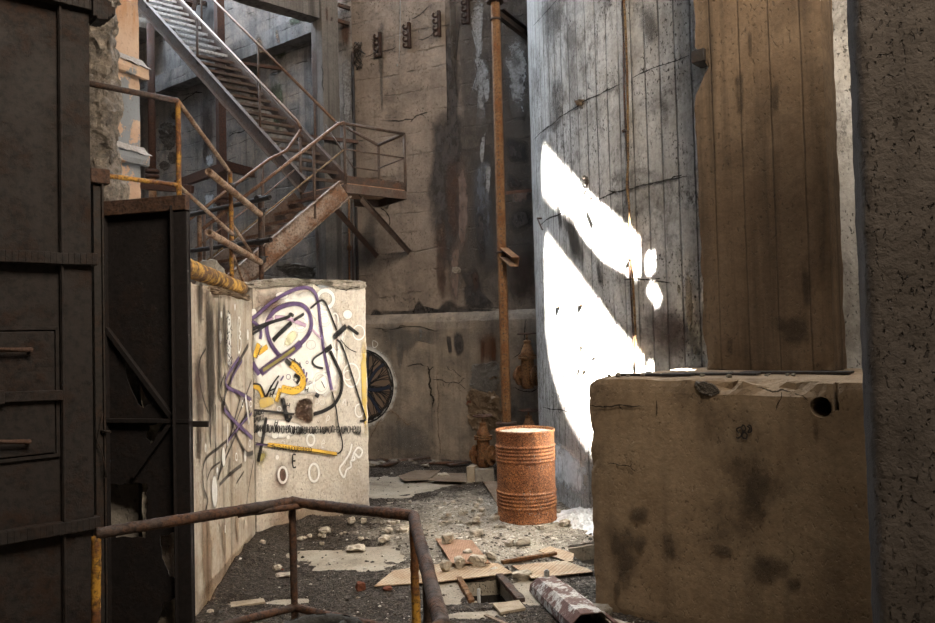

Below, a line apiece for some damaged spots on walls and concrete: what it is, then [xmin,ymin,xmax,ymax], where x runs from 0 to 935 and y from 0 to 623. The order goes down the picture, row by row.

crack [535,55,689,138]
water stain [371,0,491,315]
crack [595,175,687,201]
crack [408,363,465,407]
spalling [694,381,721,396]